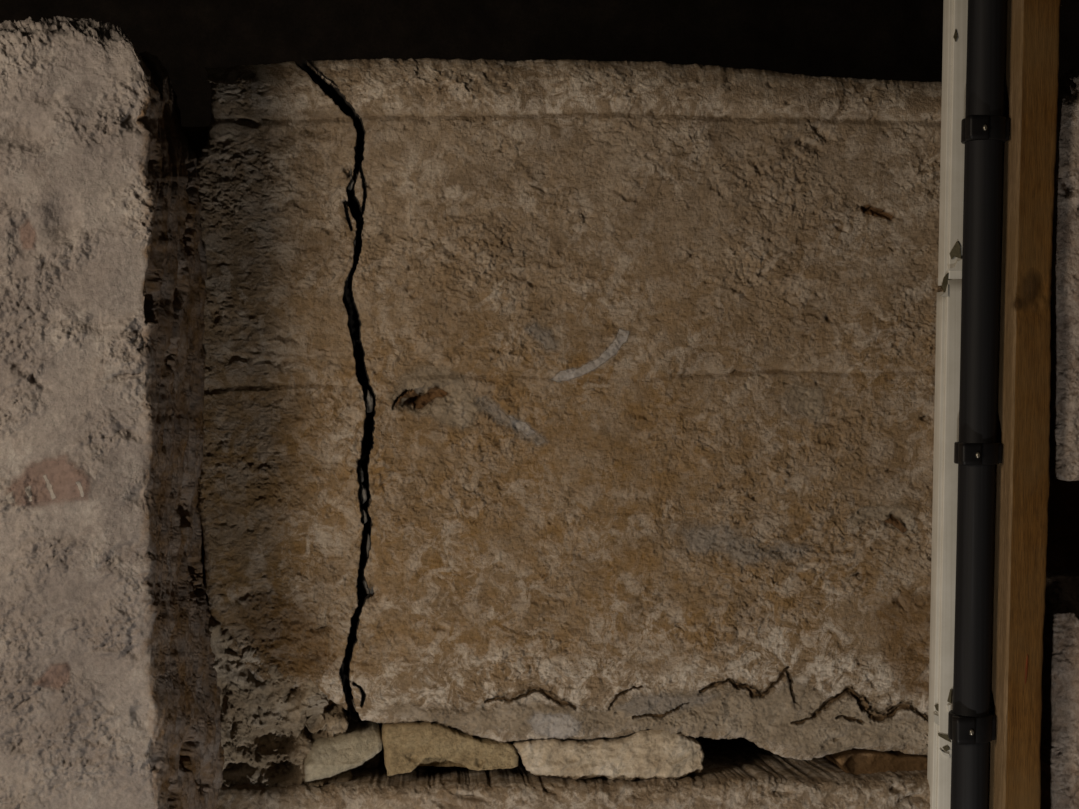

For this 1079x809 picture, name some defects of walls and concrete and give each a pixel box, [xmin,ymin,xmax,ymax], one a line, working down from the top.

crack [297,57,376,723]
crack [486,689,576,709]
spalling [390,677,949,758]
crack [609,666,928,724]